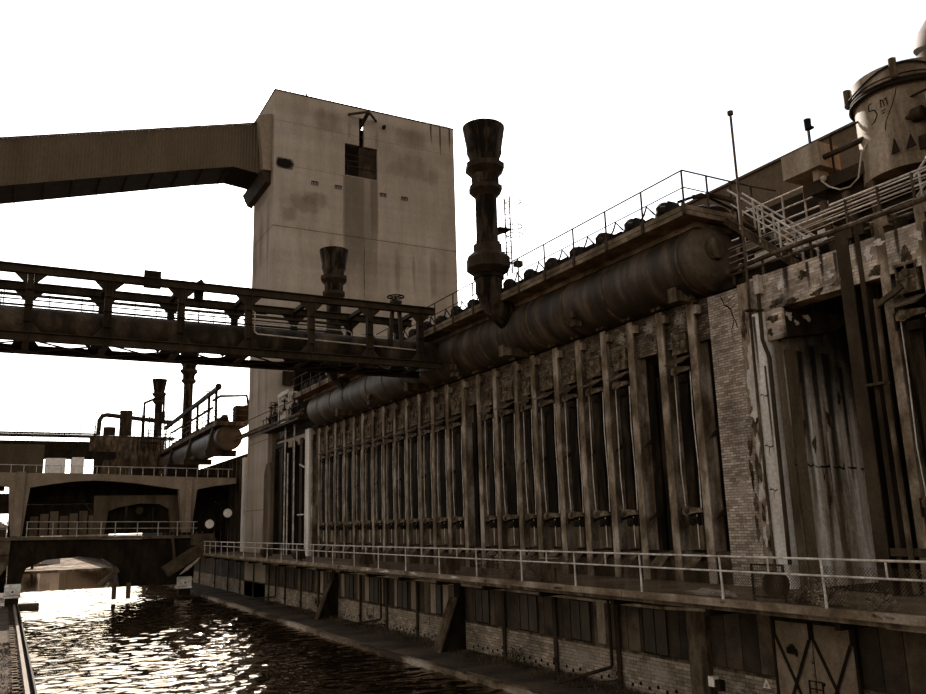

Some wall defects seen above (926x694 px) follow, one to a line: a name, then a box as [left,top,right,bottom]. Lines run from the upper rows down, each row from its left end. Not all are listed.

spalling [798,262,841,296]
peeling [863,238,886,277]
spalling [900,230,922,262]
crack [720,296,738,342]
spalling [767,274,811,336]
flaking render [741,309,773,551]